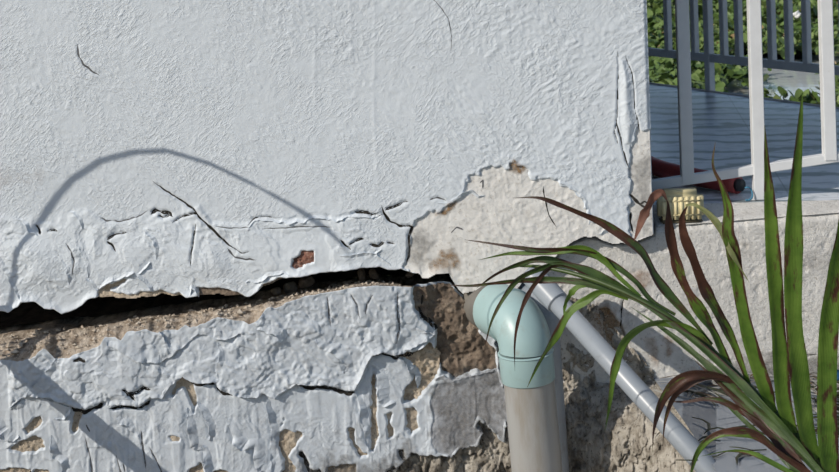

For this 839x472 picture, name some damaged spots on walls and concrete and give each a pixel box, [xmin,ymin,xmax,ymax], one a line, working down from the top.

crack [77,44,100,76]
crack [614,52,640,174]
crack [98,183,327,266]
crack [0,201,450,360]
flaking render [0,126,653,472]
crack [299,385,355,396]
peeling [561,297,695,472]